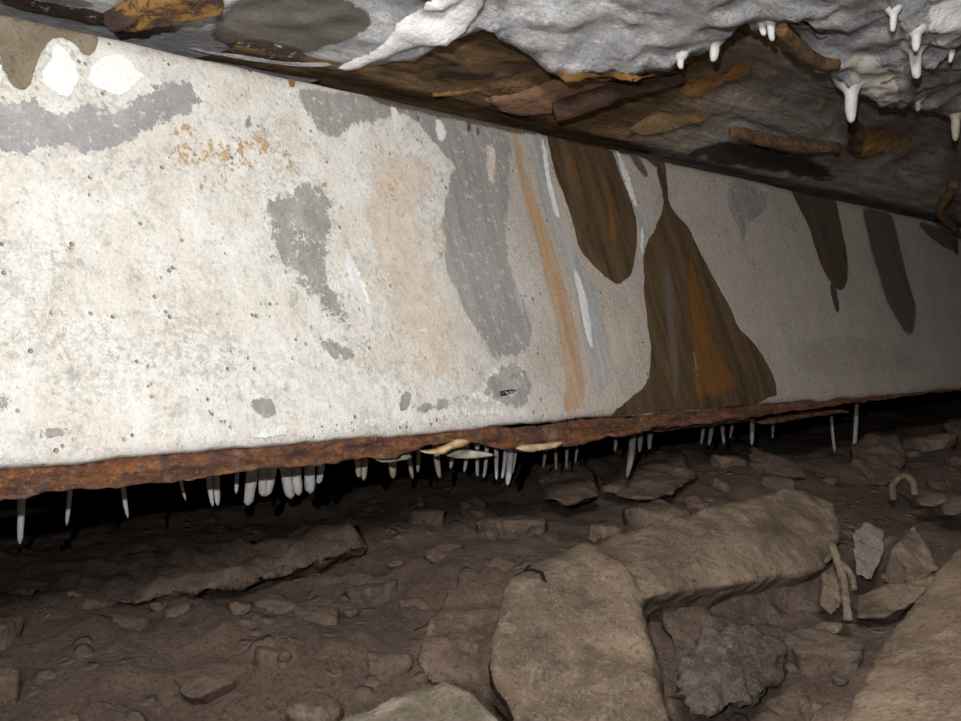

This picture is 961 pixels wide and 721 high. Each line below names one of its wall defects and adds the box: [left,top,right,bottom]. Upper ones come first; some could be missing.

leakage [0,0,145,106]
leakage [191,0,484,71]
peeling [889,0,961,71]
spalling [194,23,961,255]
peeling [264,181,359,361]
leakage [316,165,532,435]
rust [512,130,585,415]
leakage [366,95,777,416]
leakage [787,189,848,312]
rust [372,438,494,463]
rust [516,441,563,452]
rust [603,408,850,437]